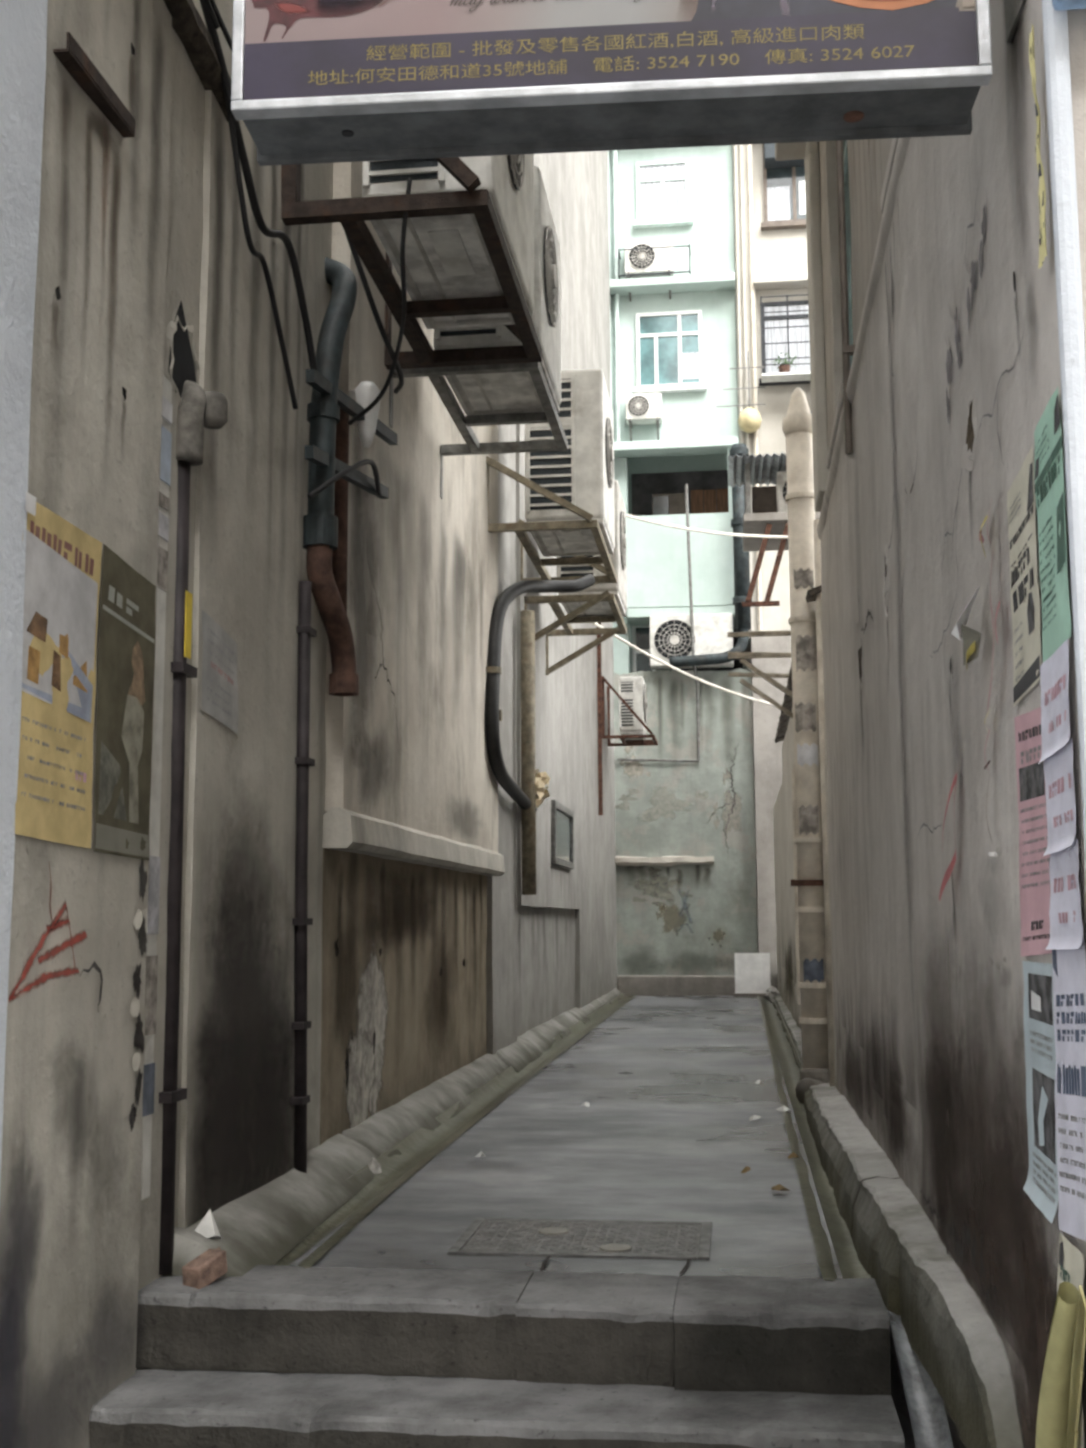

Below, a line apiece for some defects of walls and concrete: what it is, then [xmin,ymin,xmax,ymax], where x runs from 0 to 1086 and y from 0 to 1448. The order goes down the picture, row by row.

peeling [944,206,986,423]
flaking render [961,389,978,472]
crack [886,239,1026,1153]
leakage [846,1045,902,1144]
leakage [7,1203,33,1320]
leakage [927,1071,1057,1448]